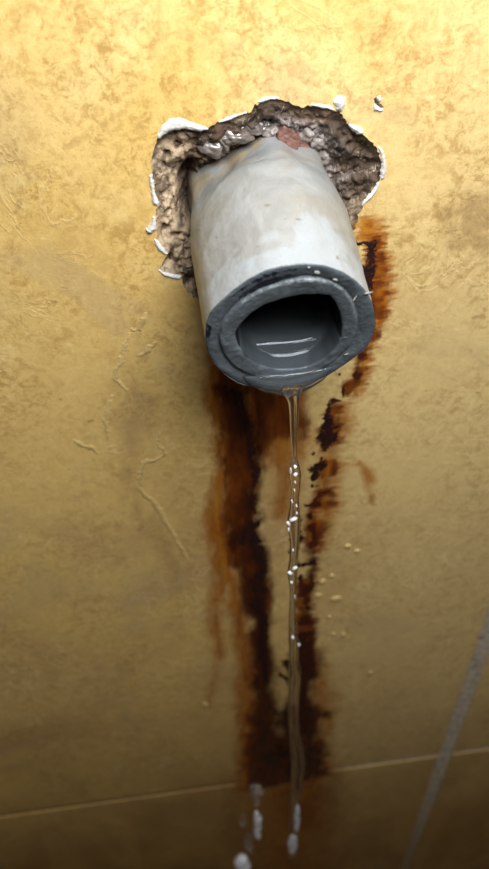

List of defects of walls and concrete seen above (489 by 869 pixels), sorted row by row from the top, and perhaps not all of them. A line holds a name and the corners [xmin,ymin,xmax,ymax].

spalling [146,95,386,298]
corrosion [205,216,397,869]